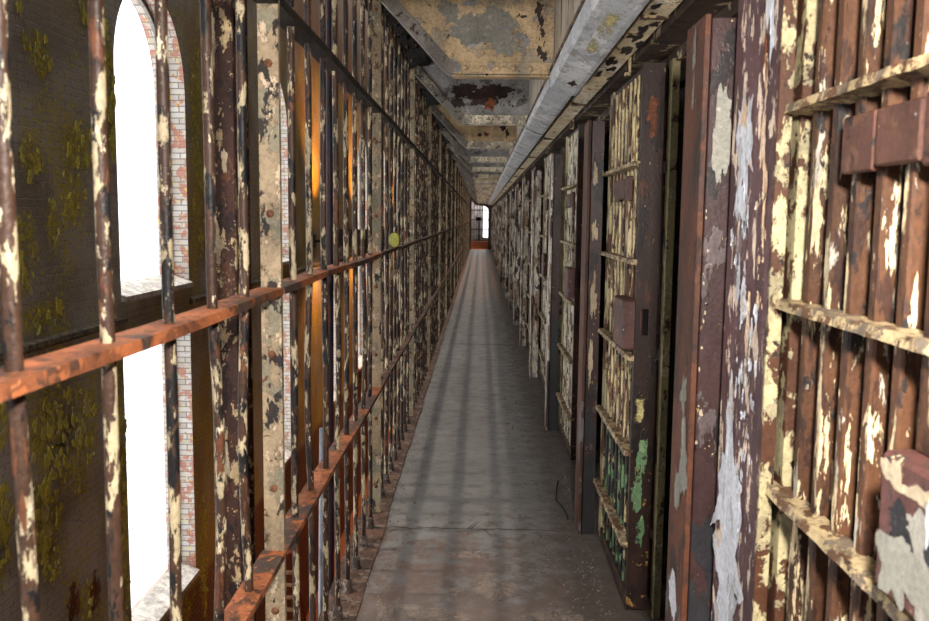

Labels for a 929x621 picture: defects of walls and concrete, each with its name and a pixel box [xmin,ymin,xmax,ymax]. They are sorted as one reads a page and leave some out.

peeling [438,1,547,62]
peeling [766,0,775,68]
peeling [450,83,523,112]
peeling [710,83,768,621]
peeling [630,440,648,548]
peeling [636,399,644,422]
peeling [674,374,698,509]
peeling [875,457,929,621]